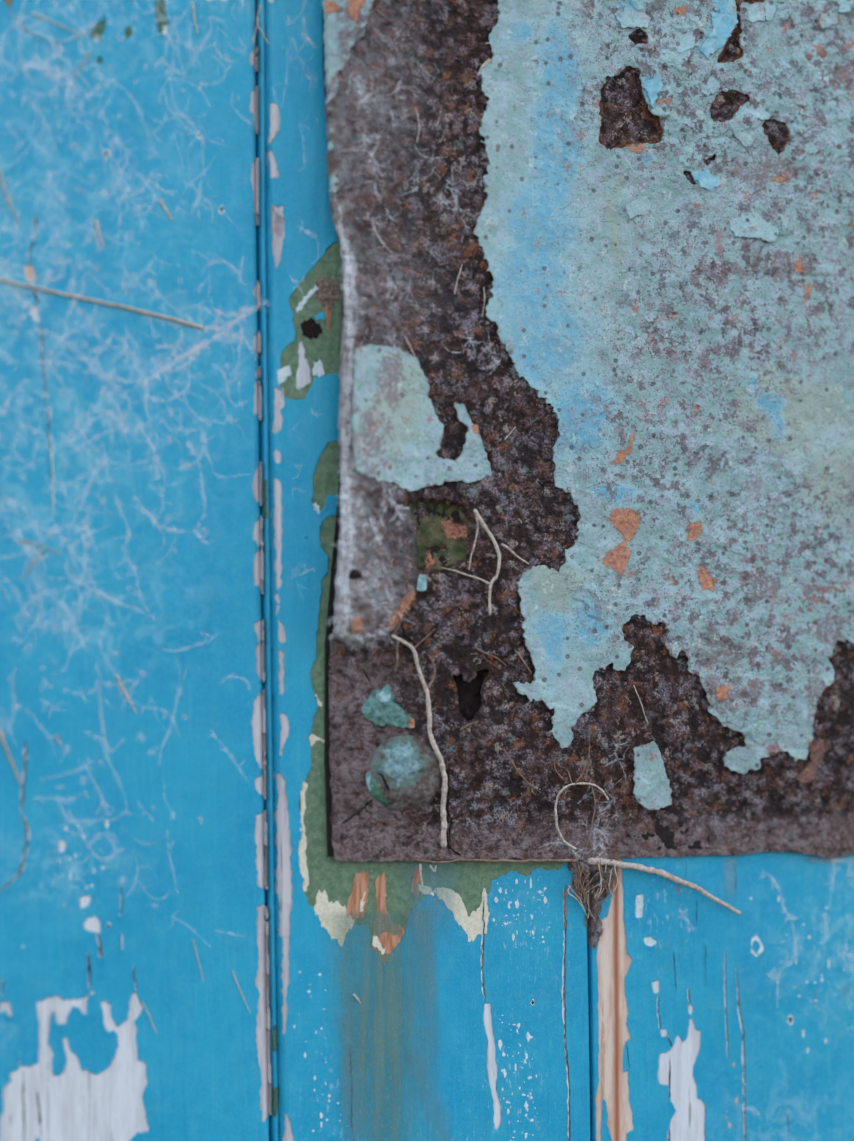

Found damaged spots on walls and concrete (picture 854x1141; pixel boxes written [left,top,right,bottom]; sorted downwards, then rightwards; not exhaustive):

peeling [155,0,169,35]
peeling [614,7,651,29]
peeling [641,73,663,109]
peeling [675,0,777,58]
peeling [249,86,285,269]
peeling [691,168,722,191]
peeling [728,211,779,242]
corrosion [324,0,854,862]
peeling [251,242,563,1141]
peeling [0,991,149,1141]
peeling [590,858,644,1141]
peeling [658,1004,706,1141]